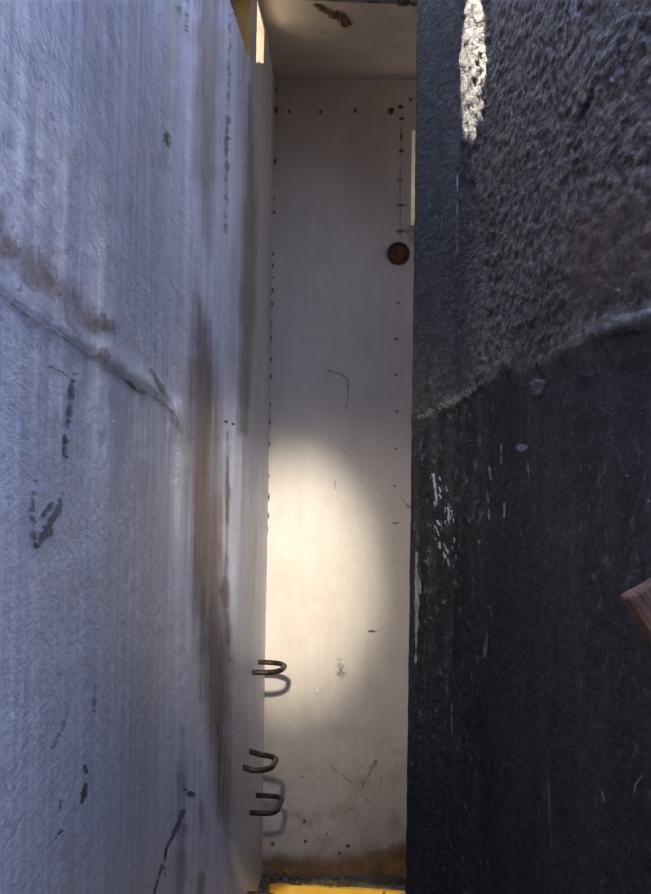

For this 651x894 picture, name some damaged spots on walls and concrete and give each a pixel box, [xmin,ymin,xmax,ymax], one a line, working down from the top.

water stain [190,323,230,819]
crack [153,810,186,894]
rust [262,844,406,879]